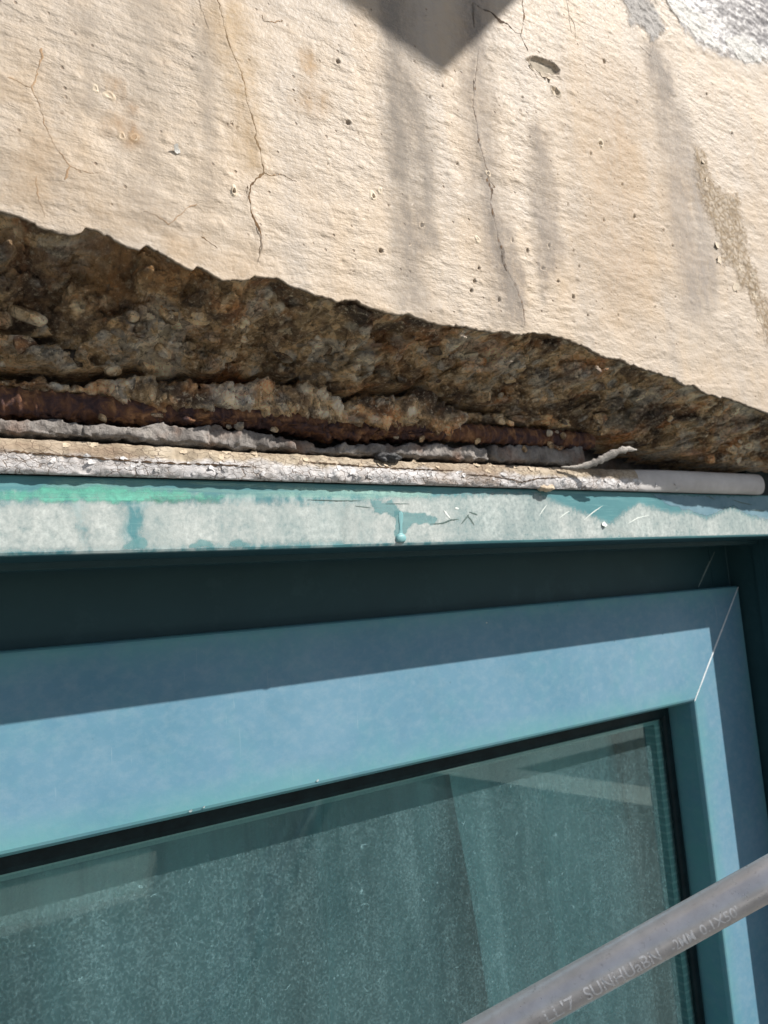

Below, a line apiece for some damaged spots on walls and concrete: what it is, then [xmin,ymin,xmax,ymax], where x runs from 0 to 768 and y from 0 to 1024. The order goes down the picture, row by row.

crack [8,48,89,179]
crack [199,0,295,261]
crack [473,53,525,320]
crack [471,1,528,50]
peeling [526,55,561,97]
peeling [624,0,665,41]
peeling [667,0,768,63]
peeling [695,146,768,344]
spalling [0,213,768,552]